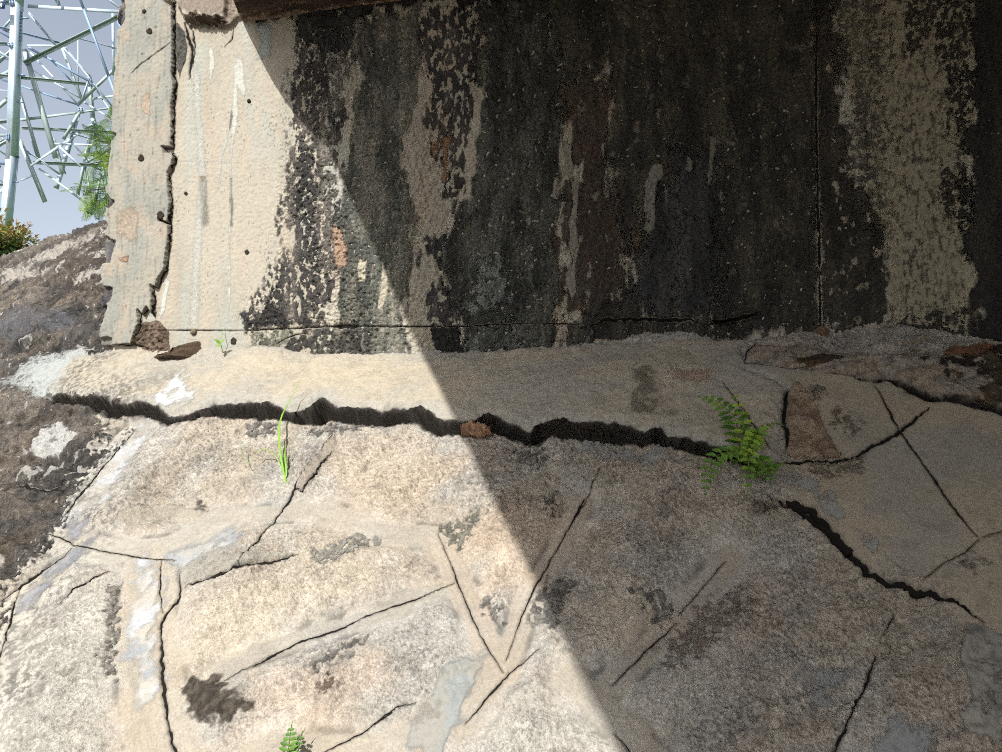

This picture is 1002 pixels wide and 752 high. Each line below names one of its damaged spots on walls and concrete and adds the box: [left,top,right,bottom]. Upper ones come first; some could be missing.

crack [132,24,196,78]
spalling [191,10,223,27]
damp [190,0,525,355]
damp [558,141,579,298]
damp [628,135,730,318]
damp [811,0,1002,354]
crack [249,314,757,344]
damp [797,353,845,369]
crack [728,342,1002,618]
crack [0,394,744,752]
crack [834,658,876,752]